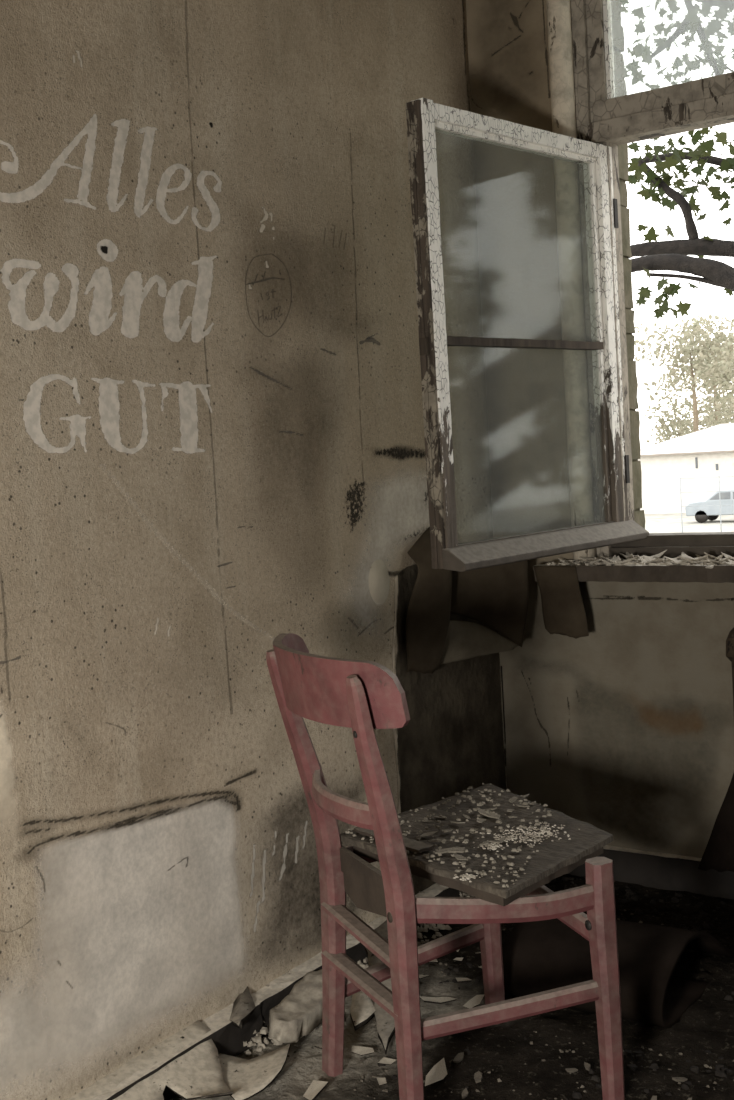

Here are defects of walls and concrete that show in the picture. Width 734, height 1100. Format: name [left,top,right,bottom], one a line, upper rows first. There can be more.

peeling [0,707,14,809]